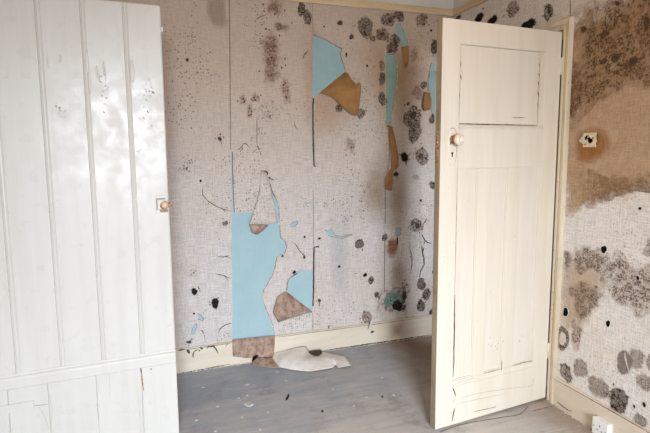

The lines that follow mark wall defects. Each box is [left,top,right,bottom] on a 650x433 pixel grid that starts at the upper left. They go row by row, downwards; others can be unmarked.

mould [258,22,292,82]
rust [580,134,605,159]
leakage [566,0,650,211]
leakage [564,247,650,347]